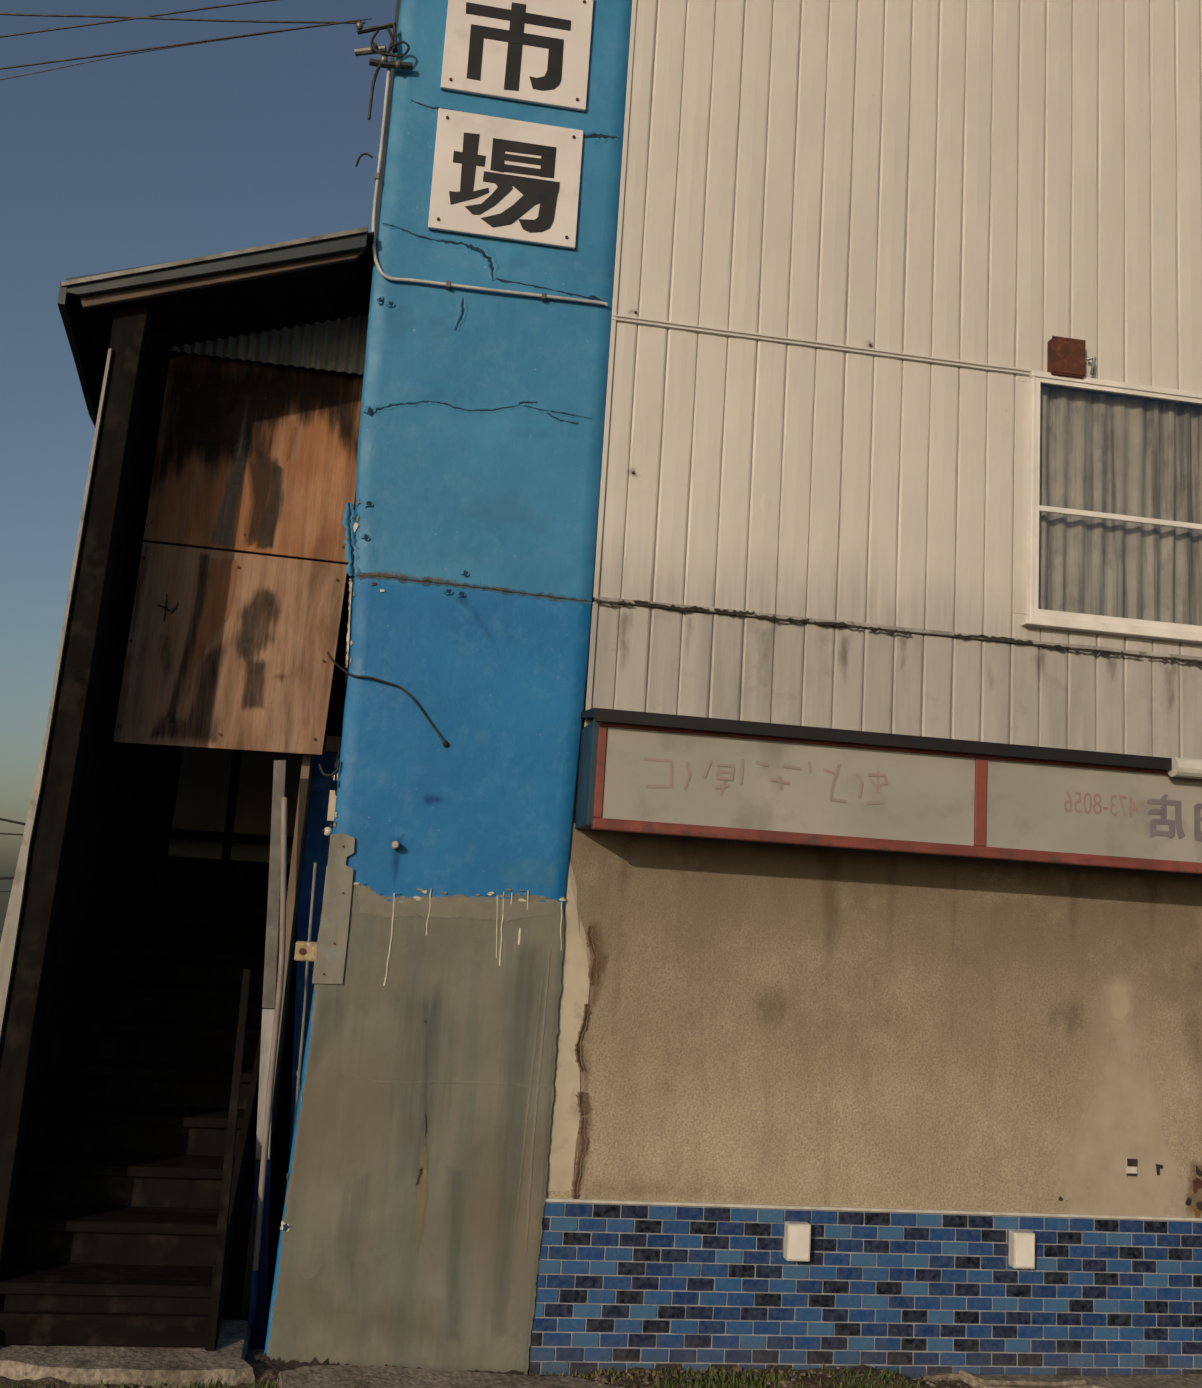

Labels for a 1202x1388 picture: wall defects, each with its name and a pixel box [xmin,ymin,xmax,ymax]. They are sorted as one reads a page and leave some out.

crack [383,222,606,332]
crack [373,398,592,427]
leakage [152,413,296,740]
crack [342,503,912,636]
spalling [345,577,355,689]
crack [954,634,1202,667]
crack [571,925,606,1199]
peeling [265,882,567,1375]
rust [1185,1166,1202,1218]